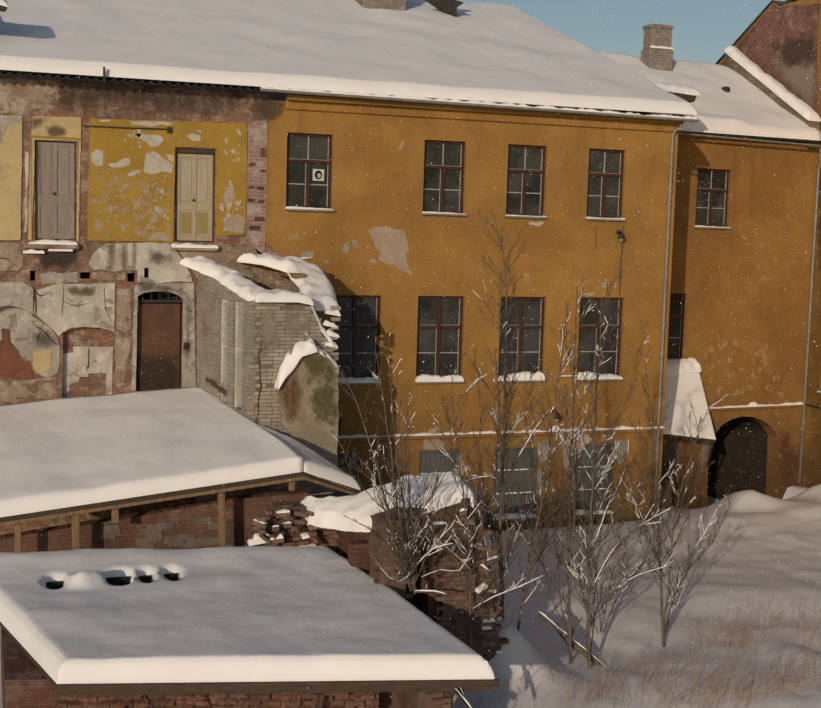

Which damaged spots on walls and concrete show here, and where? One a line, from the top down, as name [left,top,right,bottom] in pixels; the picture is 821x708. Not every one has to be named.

peeling [90,121,174,240]
spalling [220,134,266,173]
peeling [368,226,412,275]
crack [33,285,110,346]
peeling [536,440,549,495]
peeling [562,433,628,504]